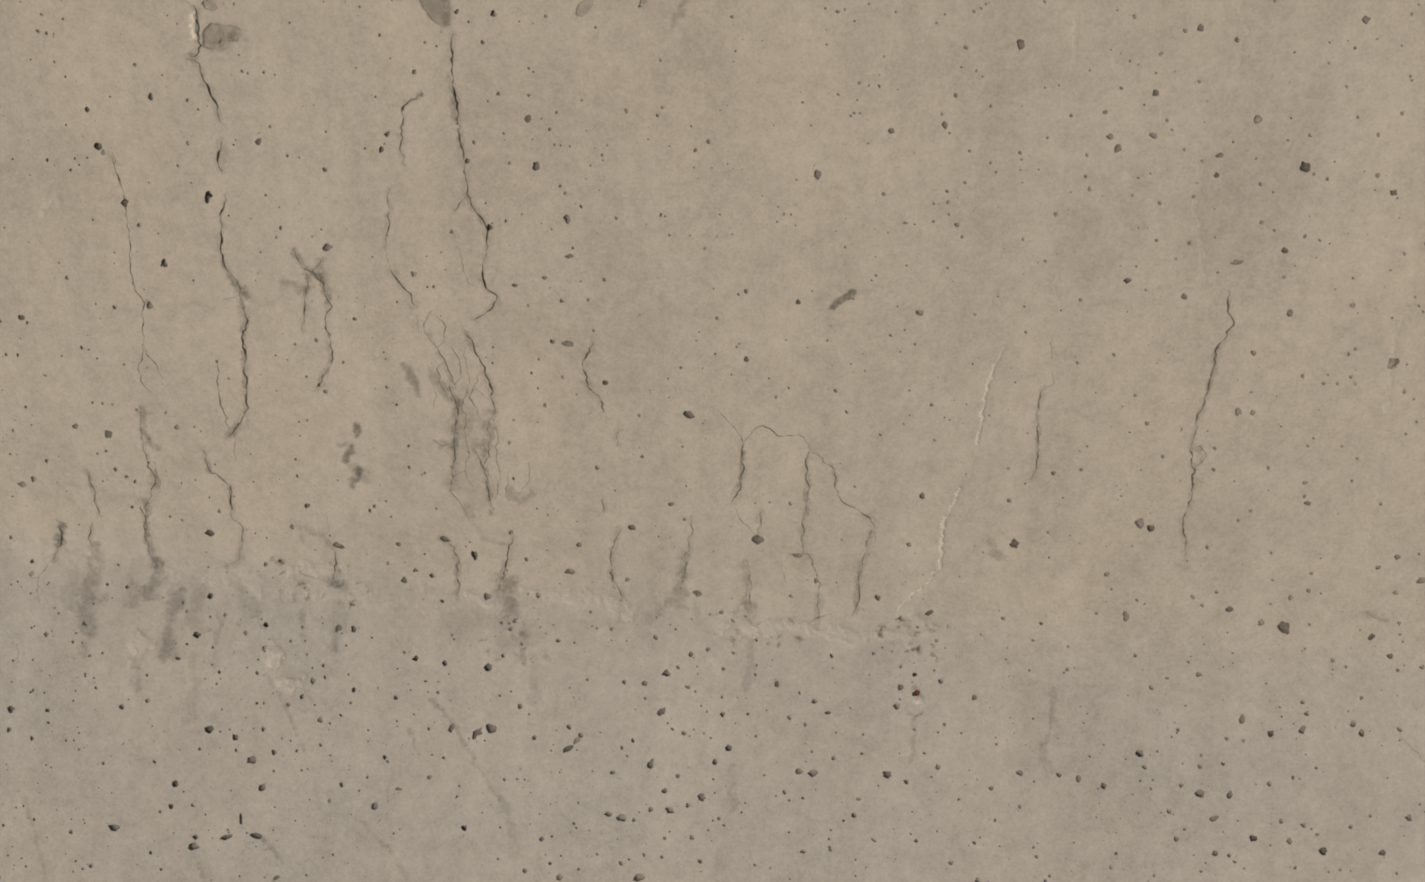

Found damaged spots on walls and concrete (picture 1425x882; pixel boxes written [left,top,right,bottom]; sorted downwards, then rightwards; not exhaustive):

crack [112,153,163,567]
crack [182,0,249,567]
crack [295,252,333,387]
crack [385,35,530,595]
crack [720,412,876,625]
crack [1182,291,1235,556]